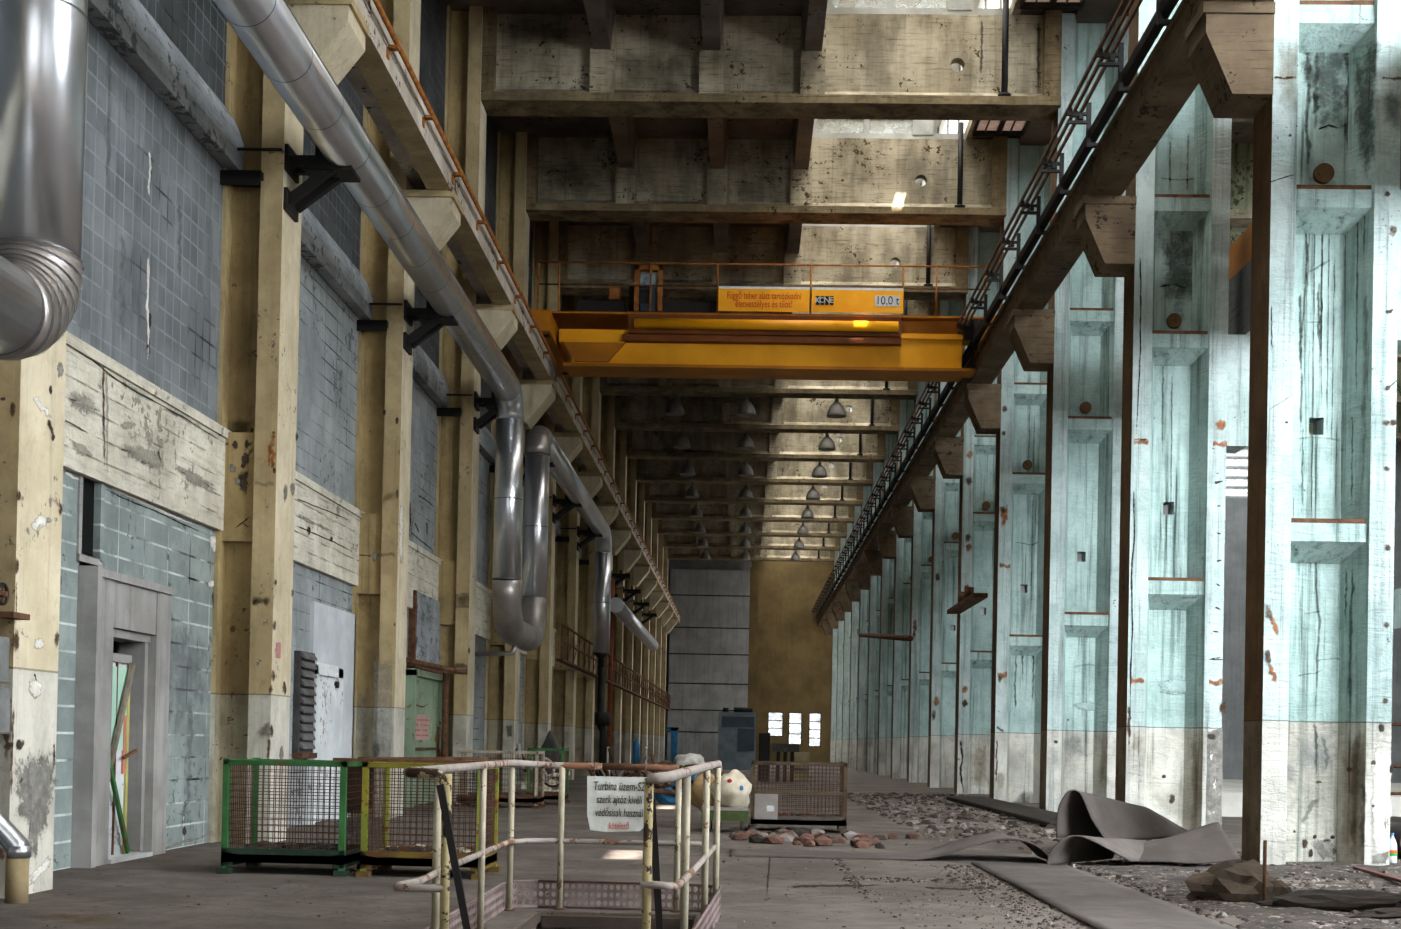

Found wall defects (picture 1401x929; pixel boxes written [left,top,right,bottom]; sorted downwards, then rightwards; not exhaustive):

damp [1270,42,1401,182]
damp [1160,231,1193,299]
spalling [121,446,215,490]
spalling [229,440,249,494]
damp [1162,367,1173,515]
corrosion [1266,606,1278,634]
corrosion [1265,650,1277,681]
spalling [15,739,55,883]